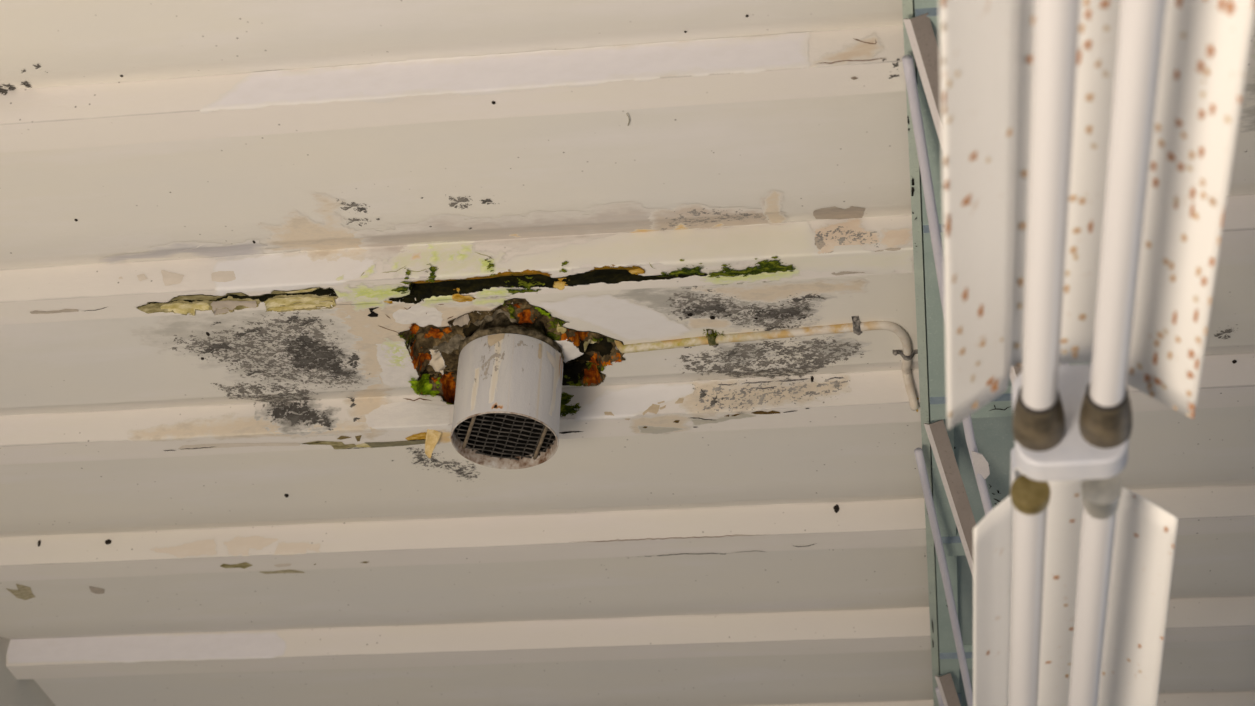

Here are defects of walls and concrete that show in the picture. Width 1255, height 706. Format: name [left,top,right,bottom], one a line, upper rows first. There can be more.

peeling [813,212,918,254]
crack [331,252,801,312]
leakage [126,305,382,442]
leakage [612,277,871,419]
spalling [604,398,810,435]